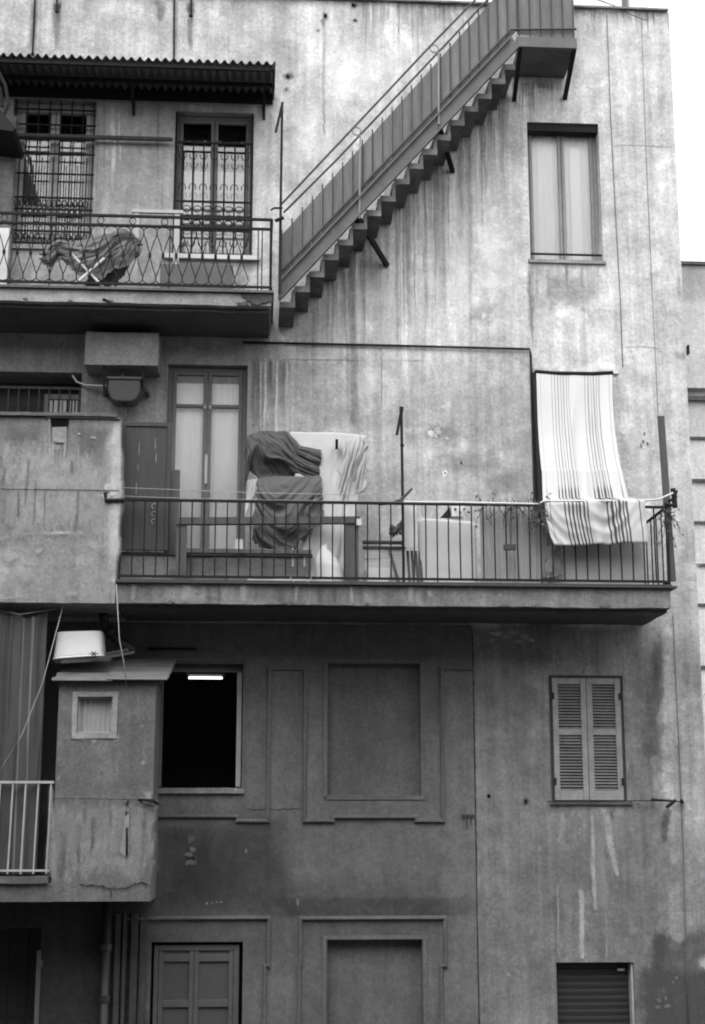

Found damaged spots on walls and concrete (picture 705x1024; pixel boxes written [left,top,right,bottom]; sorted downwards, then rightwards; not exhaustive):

leakage [260,360,288,431]
crack [79,882,149,897]
leakage [579,807,619,959]